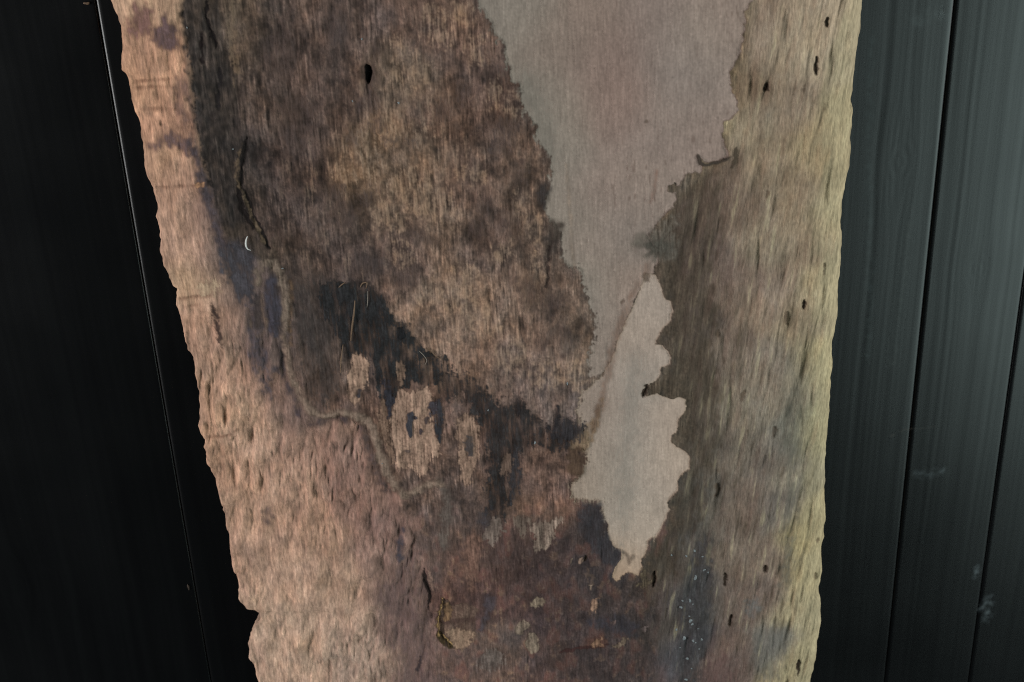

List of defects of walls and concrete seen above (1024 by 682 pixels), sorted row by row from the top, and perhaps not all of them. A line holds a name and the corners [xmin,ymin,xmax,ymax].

crack [229,137,271,252]
leakage [148,130,603,548]
peeling [478,0,753,586]